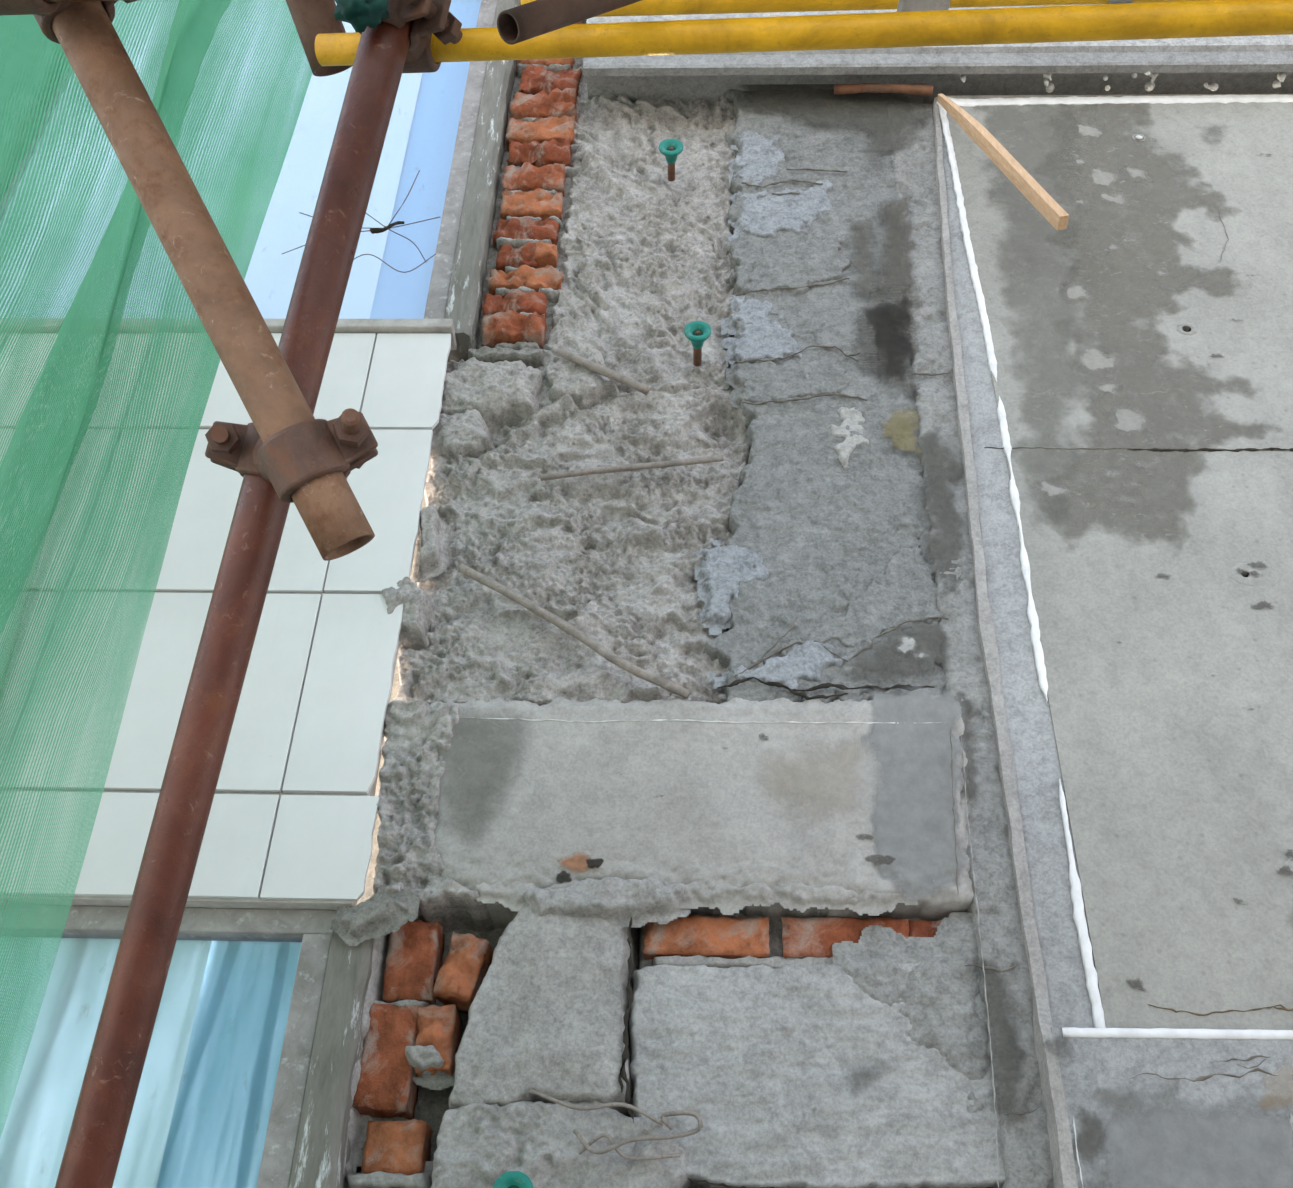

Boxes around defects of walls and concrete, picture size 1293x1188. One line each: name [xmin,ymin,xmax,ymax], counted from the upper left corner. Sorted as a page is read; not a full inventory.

crack [742,168,847,195]
crack [736,278,849,296]
leakage [853,198,922,451]
leakage [987,103,1264,540]
crack [736,345,860,363]
crack [913,370,948,378]
crack [742,393,867,405]
crack [984,445,1293,453]
spalling [330,58,945,1188]
crack [1148,1004,1293,1016]
crack [1132,1055,1293,1082]